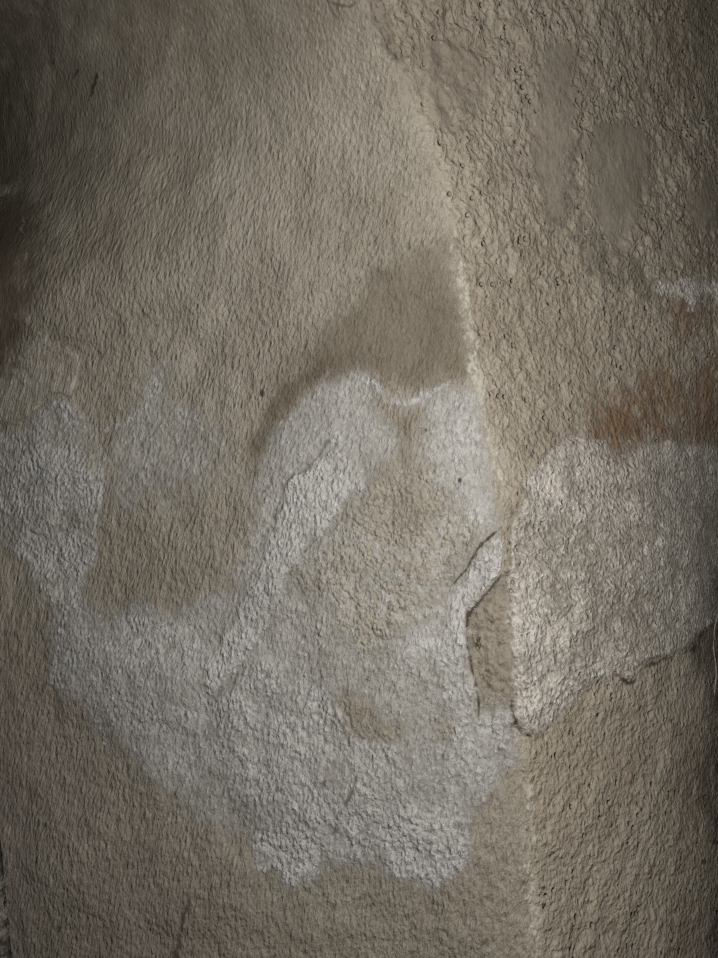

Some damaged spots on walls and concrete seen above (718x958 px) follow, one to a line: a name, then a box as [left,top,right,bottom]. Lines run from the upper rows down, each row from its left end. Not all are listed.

efflorescence [647,275,718,315]
efflorescence [0,374,718,891]
flaking render [285,465,531,754]